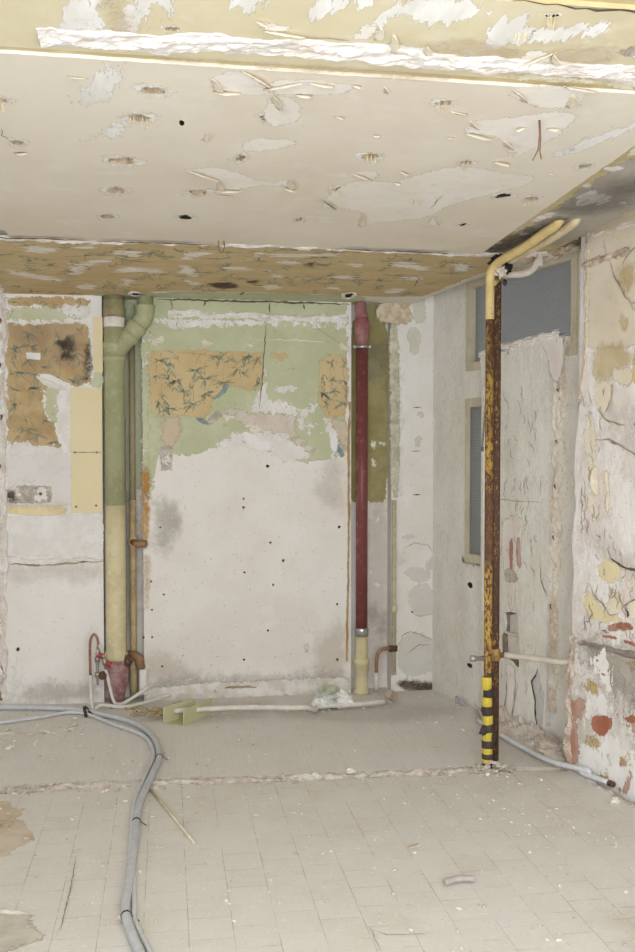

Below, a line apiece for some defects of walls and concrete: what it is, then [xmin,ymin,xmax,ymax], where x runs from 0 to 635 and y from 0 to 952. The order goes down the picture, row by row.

flaking render [119,111,162,131]
flaking render [130,83,178,99]
peeling [181,70,362,198]
peeling [255,21,307,39]
peeling [319,11,635,227]
peeling [5,303,91,323]
flaking render [7,375,71,506]
peeling [90,361,105,501]
corrosion [140,470,150,548]
peeling [96,291,413,661]
peeling [491,147,635,764]
flaking render [618,758,633,795]